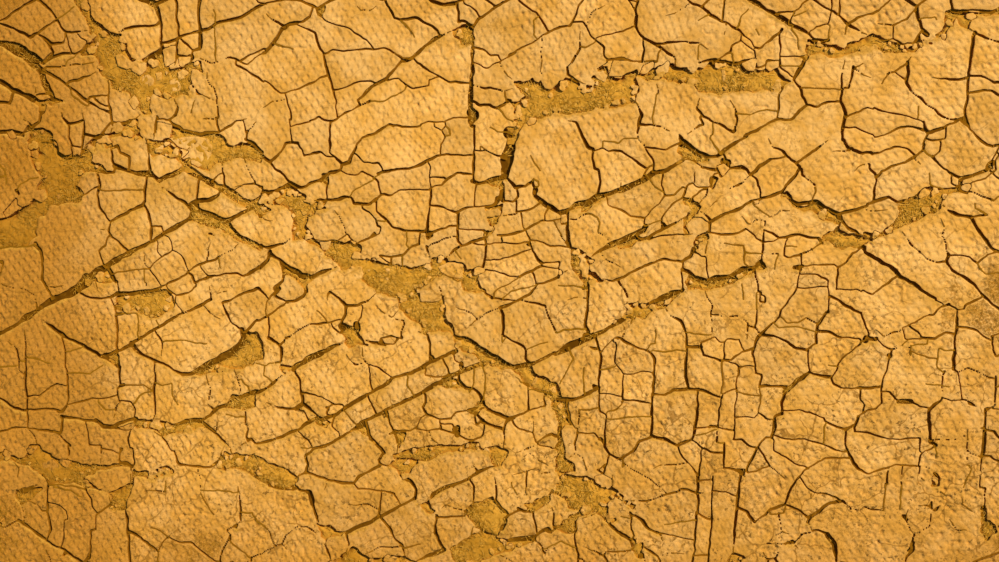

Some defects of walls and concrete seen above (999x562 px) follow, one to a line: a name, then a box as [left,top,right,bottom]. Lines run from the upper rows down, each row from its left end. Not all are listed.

spalling [0,0,263,251]
spalling [505,61,790,145]
crack [947,203,996,251]
spalling [196,332,265,376]
spalling [212,179,636,533]
crack [864,337,961,439]
crack [908,311,999,388]
spalling [0,444,174,516]
crack [124,485,316,562]
crack [226,331,564,561]
spalling [445,496,533,562]
crack [494,479,595,562]